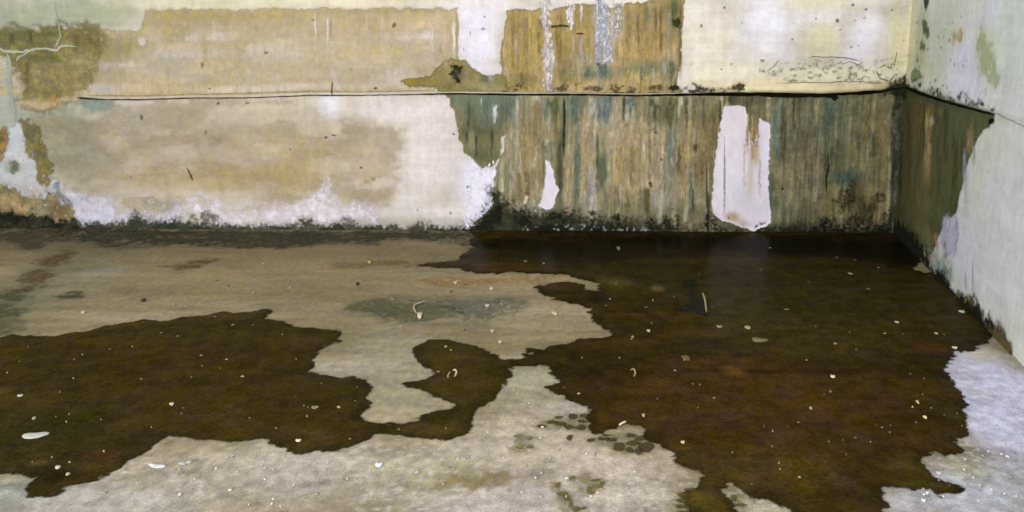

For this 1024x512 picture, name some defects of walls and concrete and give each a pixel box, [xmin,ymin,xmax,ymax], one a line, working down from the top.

crack [0,3,76,126]
flaking render [449,63,464,83]
peeling [538,0,557,91]
peeling [594,0,625,64]
flaking render [0,114,78,224]
peeling [450,160,497,229]
water stain [0,0,1005,339]
peeling [523,143,559,212]
peeling [702,105,783,231]
peeling [939,215,958,257]